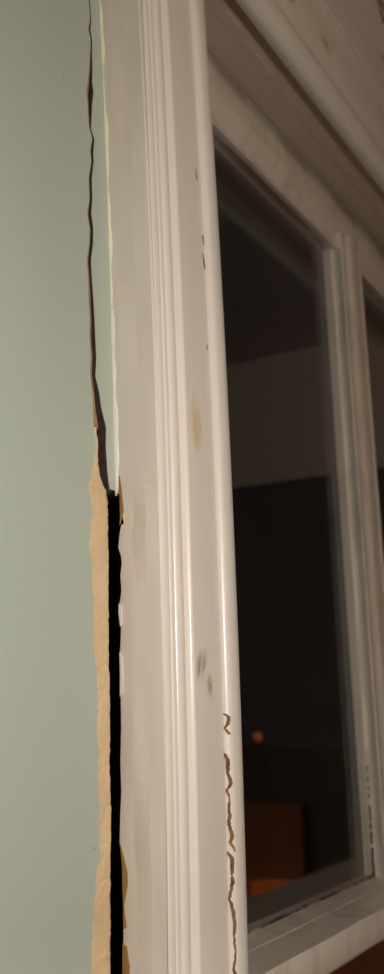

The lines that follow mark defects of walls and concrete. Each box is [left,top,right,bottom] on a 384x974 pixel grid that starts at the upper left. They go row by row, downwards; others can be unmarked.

crack [86,0,110,489]
spalling [87,427,128,974]
peeling [122,943,130,974]
crack [223,714,237,974]